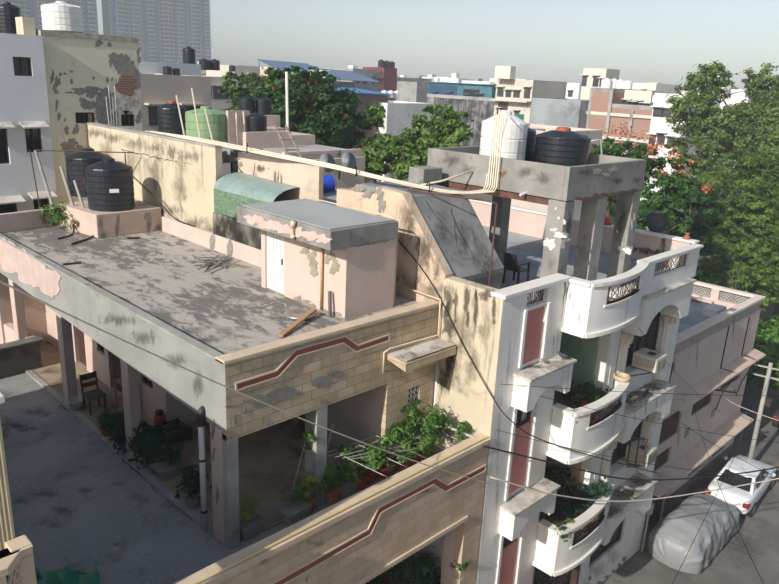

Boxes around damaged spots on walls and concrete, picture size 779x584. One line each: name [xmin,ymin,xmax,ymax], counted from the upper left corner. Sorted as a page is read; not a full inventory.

spalling [50,40,142,156]
peeling [0,238,61,298]
peeling [243,214,340,277]
crack [426,201,493,279]
peeling [543,207,570,250]
water stain [443,279,496,337]
peeling [243,386,301,408]
water stain [439,347,457,389]